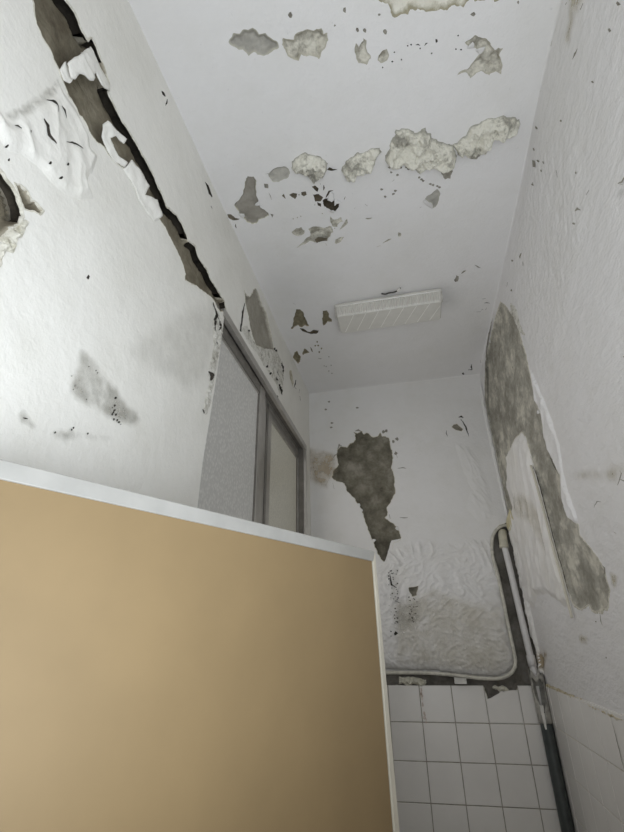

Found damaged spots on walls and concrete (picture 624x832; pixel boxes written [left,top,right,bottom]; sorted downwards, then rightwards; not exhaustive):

flaking render [367,0,502,19]
flaking render [228,24,336,61]
flaking render [455,35,504,79]
flaking render [0,168,45,267]
crack [15,0,245,344]
flaking render [234,166,290,225]
flaking render [282,184,348,248]
water stain [109,397,126,425]
flaking render [325,429,408,562]